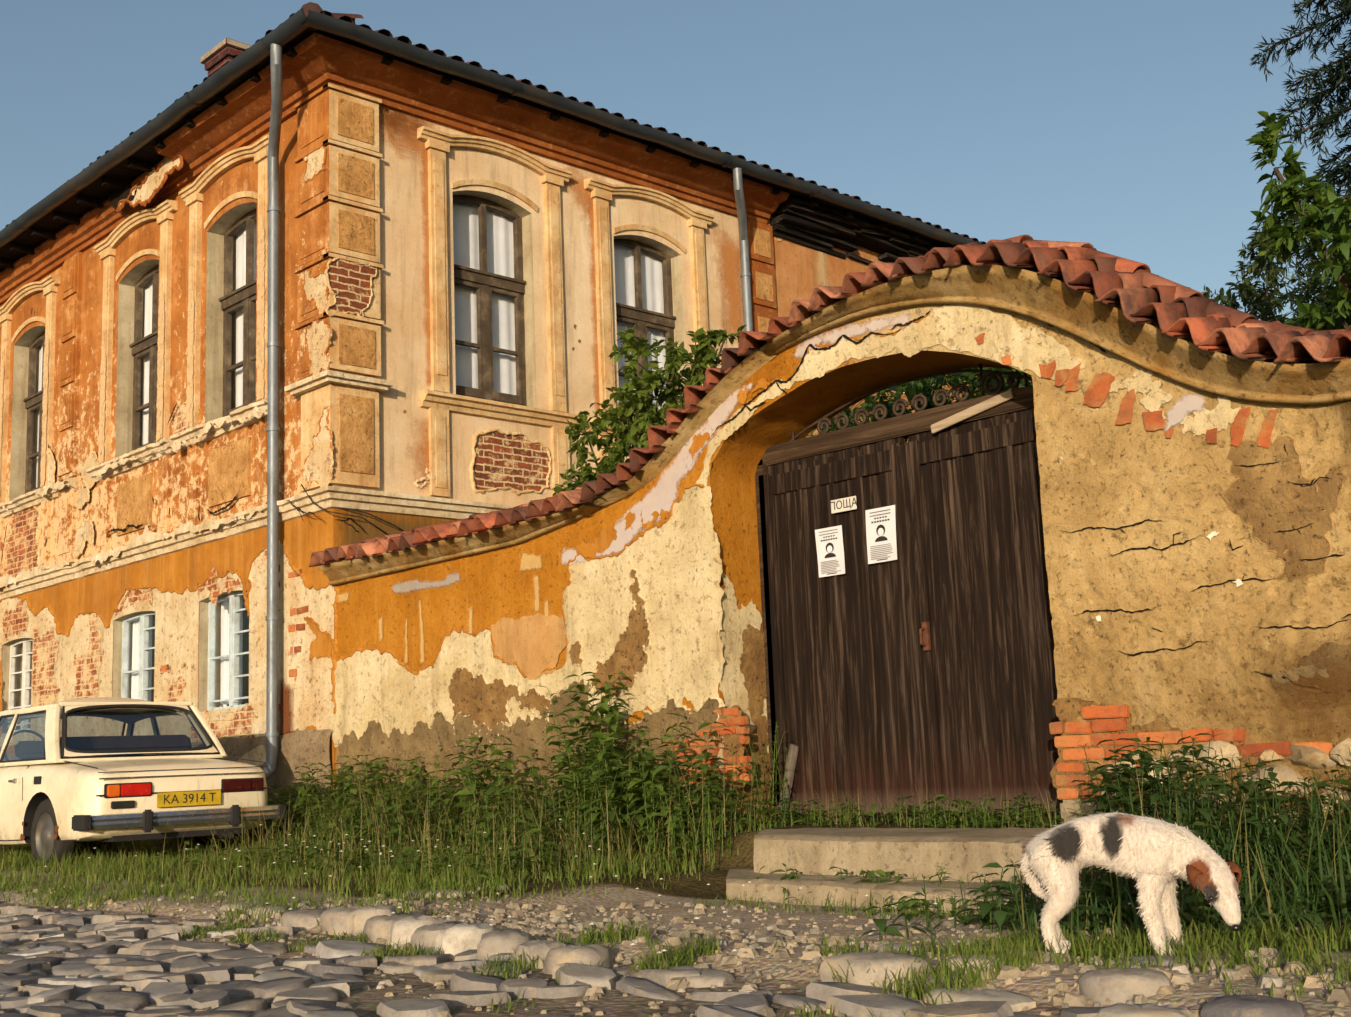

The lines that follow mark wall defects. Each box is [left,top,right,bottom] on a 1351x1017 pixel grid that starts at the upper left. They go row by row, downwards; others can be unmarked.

flaking render [303,257,378,376]
crack [1236,443,1330,487]
peeling [0,280,1350,829]
crack [1060,519,1198,556]
crack [1191,523,1345,592]
crack [1074,606,1208,656]